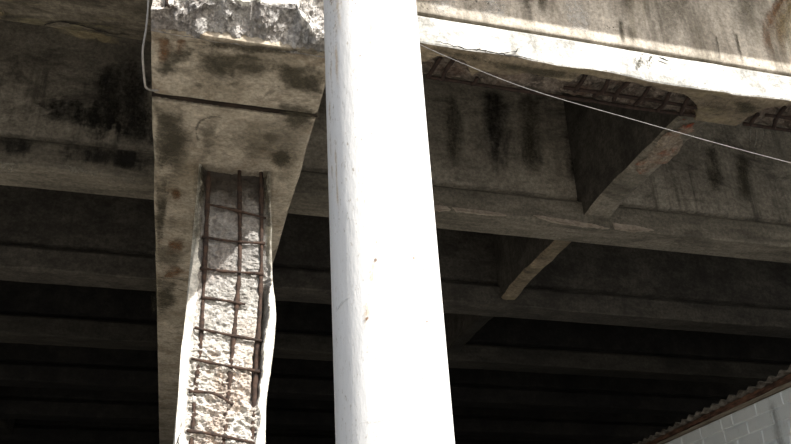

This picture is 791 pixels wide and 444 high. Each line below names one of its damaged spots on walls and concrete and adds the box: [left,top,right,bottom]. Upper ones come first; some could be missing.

spalling [151,0,325,58]
corrosion [763,0,791,41]
damp [161,48,194,74]
damp [200,43,297,76]
damp [279,65,322,93]
damp [501,63,565,78]
damp [43,62,185,170]
damp [284,106,312,128]
spalling [421,56,697,174]
spalling [742,104,791,132]
damp [273,151,290,166]
spalling [183,166,272,444]